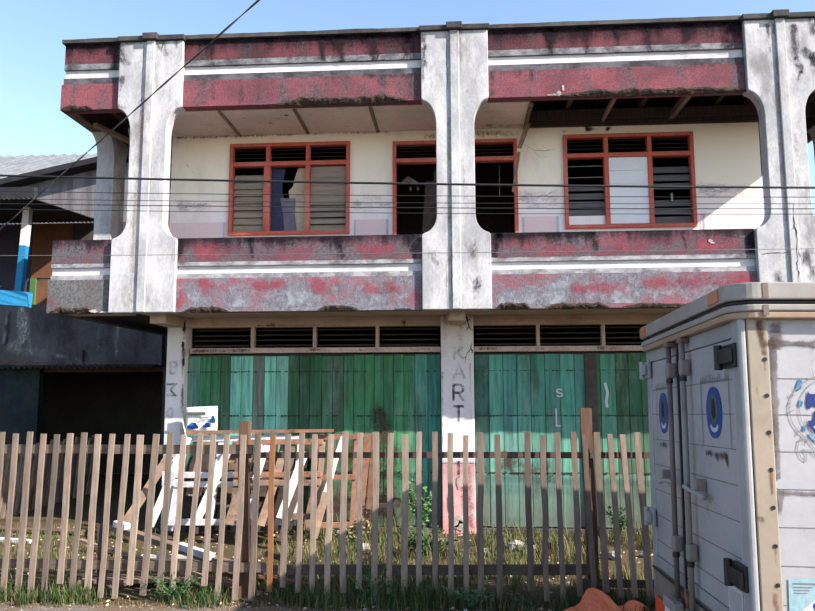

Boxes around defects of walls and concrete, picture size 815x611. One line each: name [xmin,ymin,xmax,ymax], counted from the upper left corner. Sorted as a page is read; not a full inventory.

damp [791,24,815,75]
crack [765,207,807,280]
flaking render [181,283,251,377]
flaking render [278,282,408,312]
crack [451,248,473,361]
flaking render [496,275,688,310]